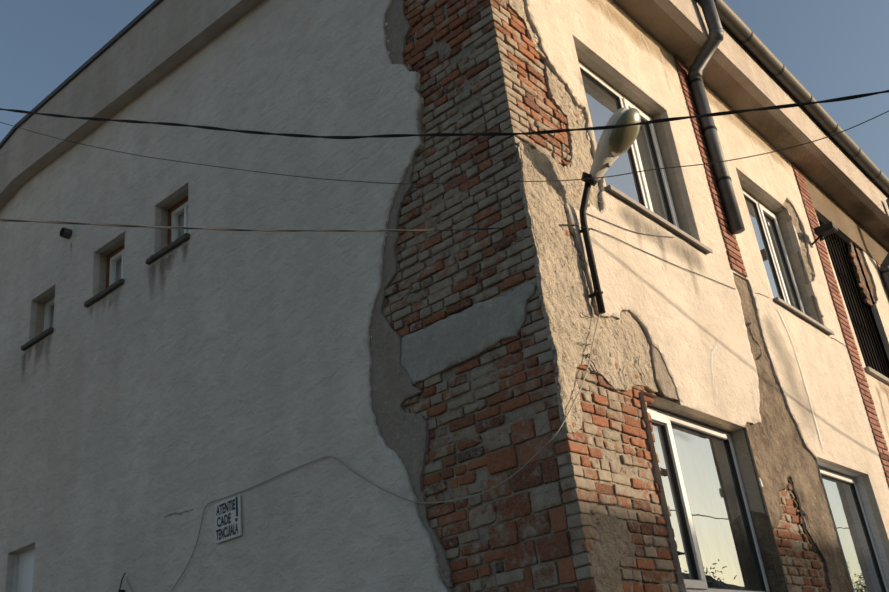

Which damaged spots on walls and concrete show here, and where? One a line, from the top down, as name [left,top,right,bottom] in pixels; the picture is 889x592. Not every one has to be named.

flaking render [369,0,681,592]
flaking render [733,274,853,592]
flaking render [781,201,817,282]
flaking render [847,242,876,307]